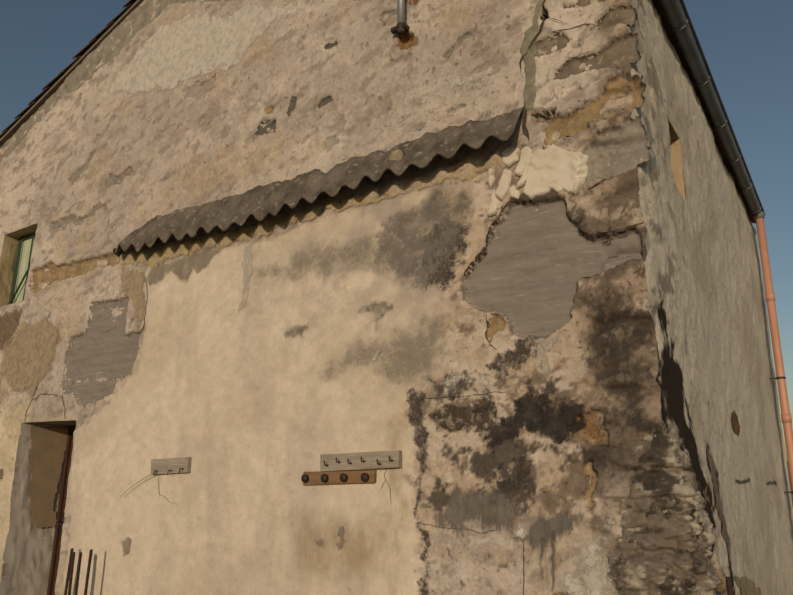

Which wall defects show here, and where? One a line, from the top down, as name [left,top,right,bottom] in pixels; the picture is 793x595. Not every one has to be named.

crack [519,0,596,139]
flaking render [488,0,651,217]
water stain [120,156,506,328]
flaking render [486,313,506,342]
water stain [407,285,656,561]
water stain [435,456,615,595]